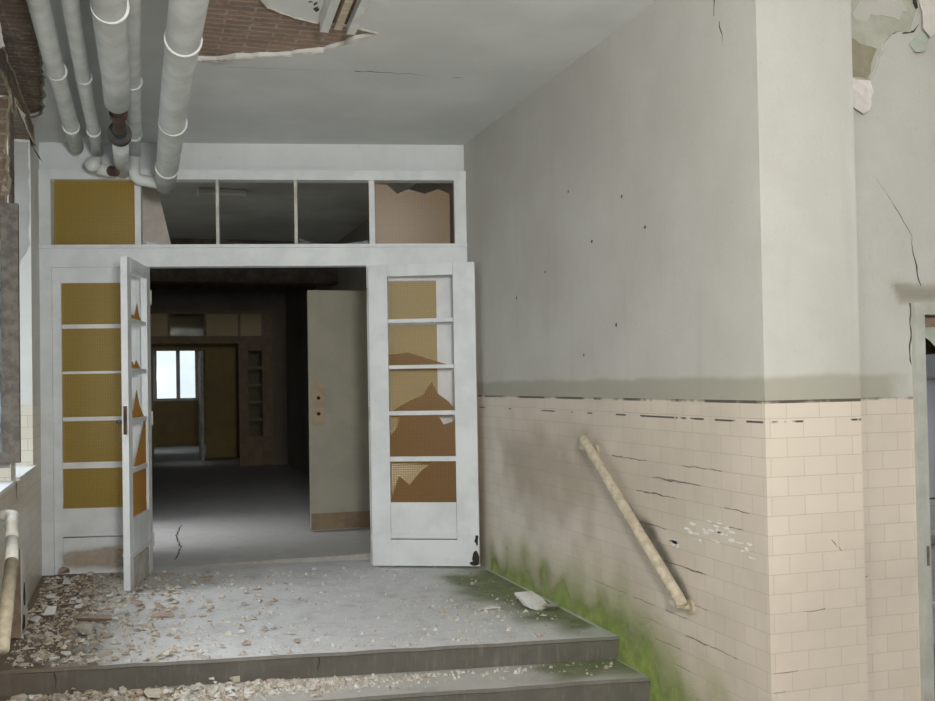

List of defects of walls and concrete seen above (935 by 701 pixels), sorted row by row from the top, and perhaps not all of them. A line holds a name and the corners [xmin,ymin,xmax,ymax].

flaking render [197,0,378,63]
peeling [851,0,935,114]
flaking render [0,0,46,265]
crack [875,177,921,365]
peeling [925,316,935,346]